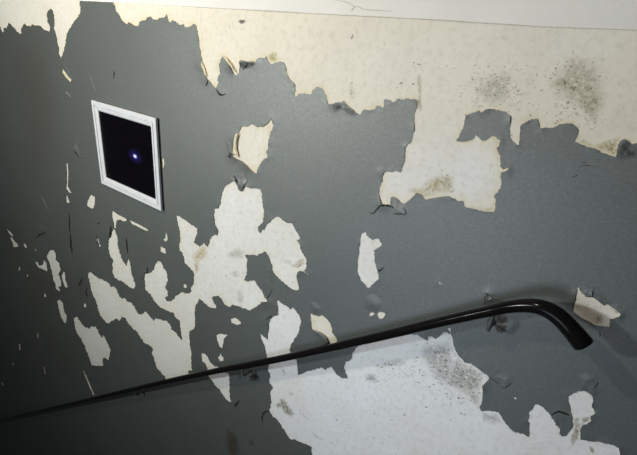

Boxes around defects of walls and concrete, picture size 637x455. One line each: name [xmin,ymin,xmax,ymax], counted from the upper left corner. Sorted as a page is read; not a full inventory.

peeling [113,2,637,215]
peeling [35,250,68,291]
peeling [88,119,308,379]
peeling [357,232,382,288]
peeling [57,300,111,366]
peeling [573,284,621,327]
peeling [201,334,231,402]
peeling [260,301,620,455]